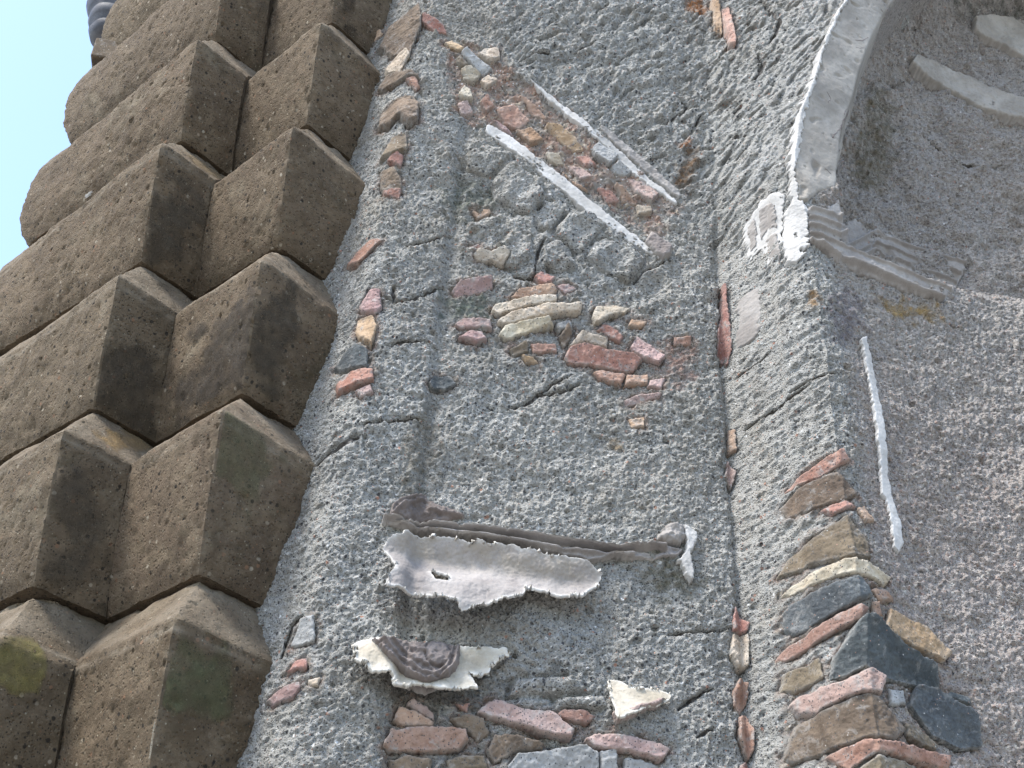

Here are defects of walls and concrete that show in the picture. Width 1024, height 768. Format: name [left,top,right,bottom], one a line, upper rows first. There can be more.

crack [513,378,578,410]
crack [745,375,826,431]
crack [317,419,419,467]
spalling [383,679,672,768]